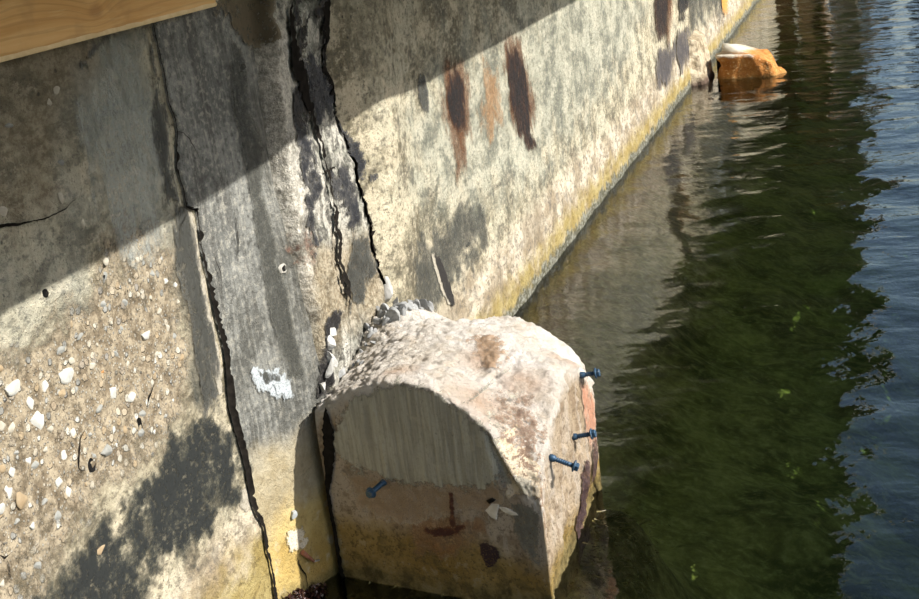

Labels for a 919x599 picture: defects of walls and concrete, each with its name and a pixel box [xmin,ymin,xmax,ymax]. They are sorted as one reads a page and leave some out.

rust [441,57,472,186]
rust [503,31,538,152]
crack [0,199,76,228]
crack [153,23,278,599]
crack [289,0,386,599]
rust [424,492,466,537]